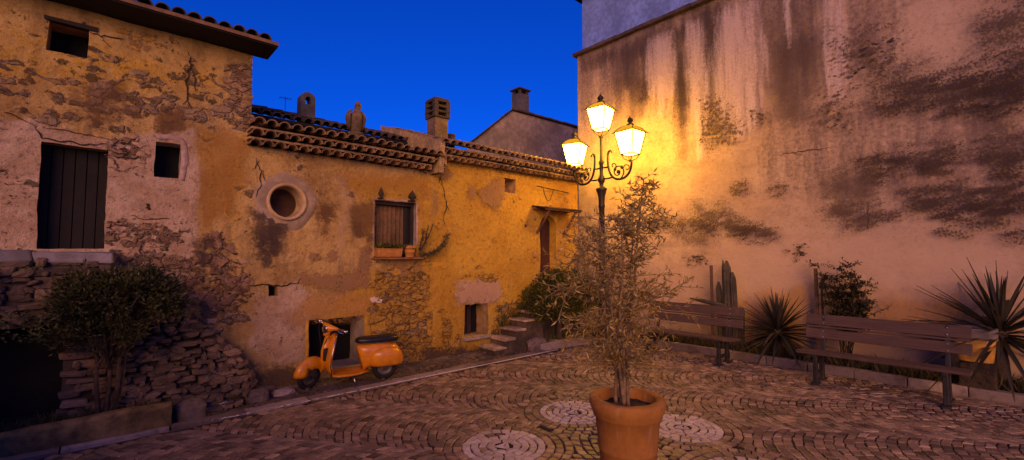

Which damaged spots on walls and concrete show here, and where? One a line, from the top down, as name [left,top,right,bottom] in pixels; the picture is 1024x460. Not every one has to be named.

crack [183,52,196,109]
spalling [223,63,255,129]
leakage [582,1,768,161]
leakage [818,0,1024,245]
crack [255,159,265,196]
spalling [104,203,255,324]
leakage [250,211,288,267]
crack [248,279,300,287]
spalling [298,246,456,362]
spalling [454,273,523,335]
leakage [650,180,781,246]